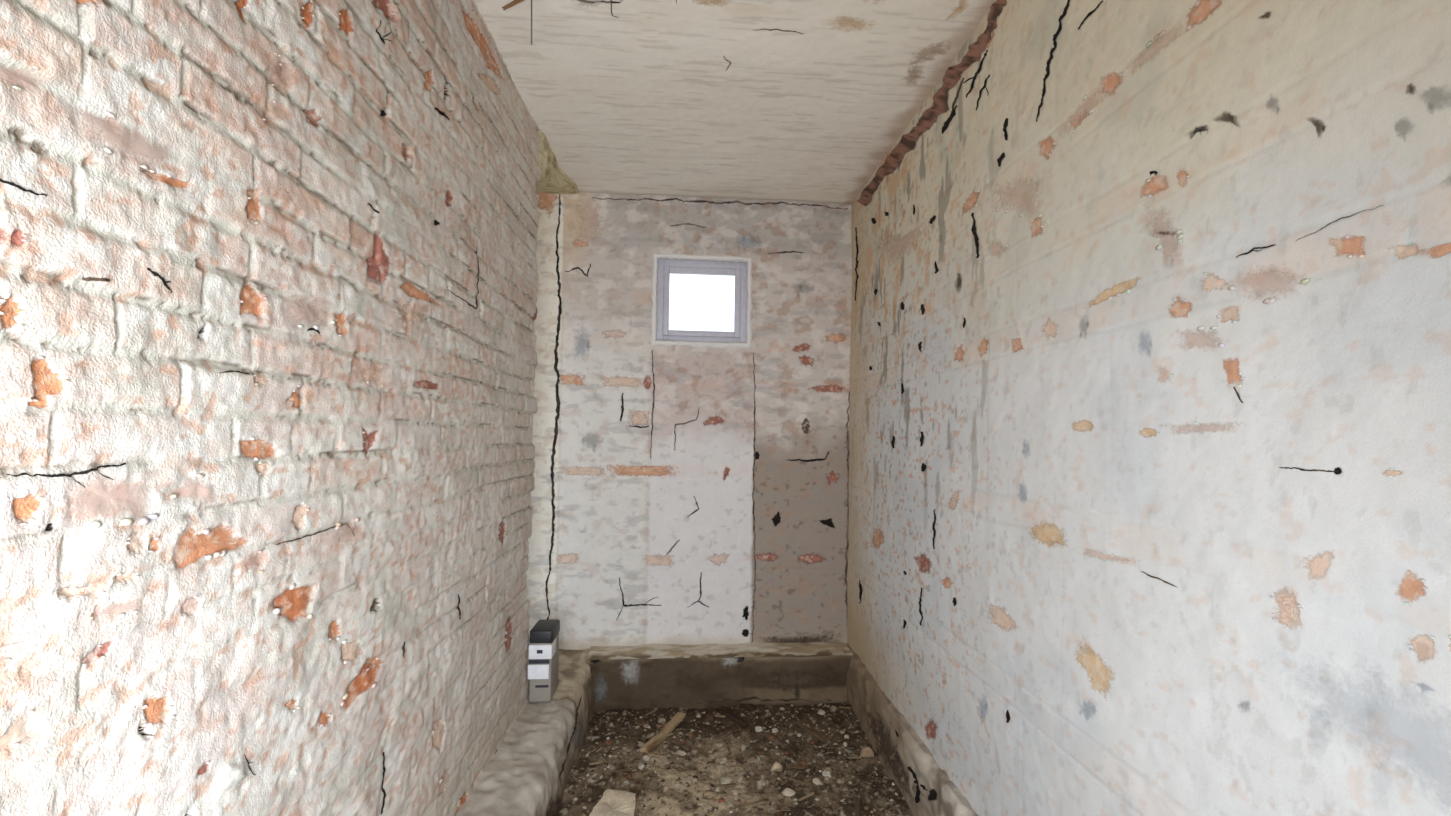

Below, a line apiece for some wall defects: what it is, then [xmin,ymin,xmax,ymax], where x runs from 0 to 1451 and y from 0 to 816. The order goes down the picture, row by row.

spalling [857,0,1007,206]
crack [942,0,1103,167]
crack [0,179,47,196]
spalling [0,229,28,247]
crack [971,213,980,258]
crack [545,194,939,643]
crack [7,463,126,488]
spalling [73,480,265,573]
spalling [273,583,316,621]
crack [903,571,957,628]
spalling [318,621,381,726]
spalling [1076,644,1114,692]